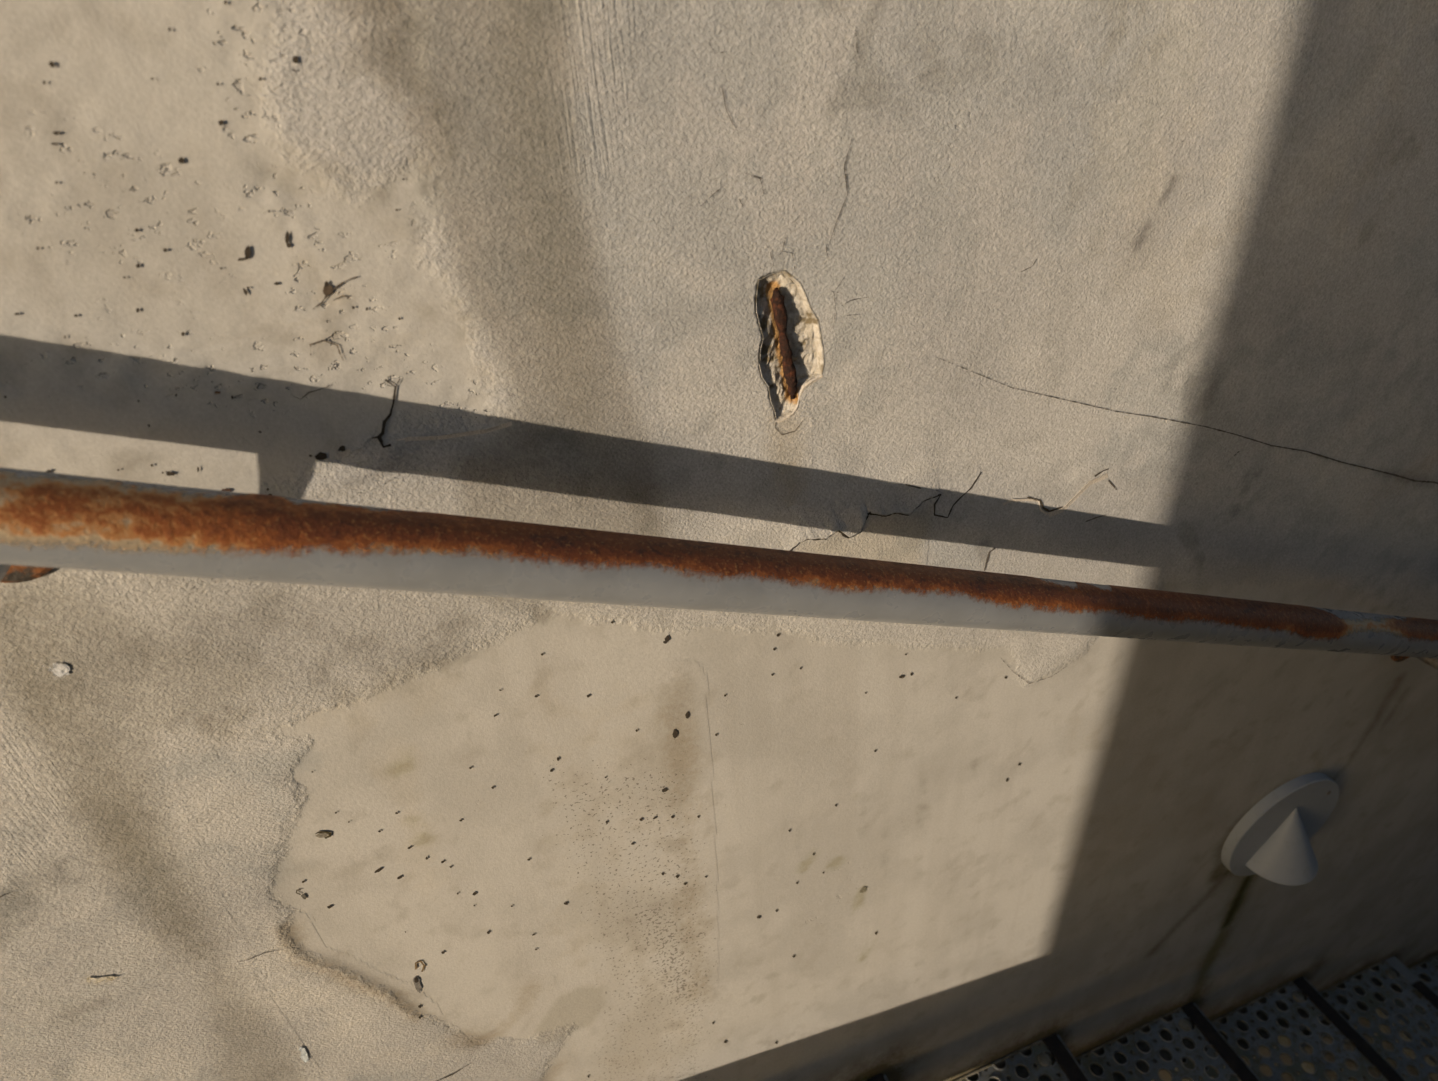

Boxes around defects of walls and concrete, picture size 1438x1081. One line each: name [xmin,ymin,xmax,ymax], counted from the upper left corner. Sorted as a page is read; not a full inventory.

spalling [756,270,824,435]
crack [372,379,400,448]
crack [937,357,1438,494]
peeling [772,460,982,565]
peeling [1003,469,1117,517]
damp [1216,874,1257,932]